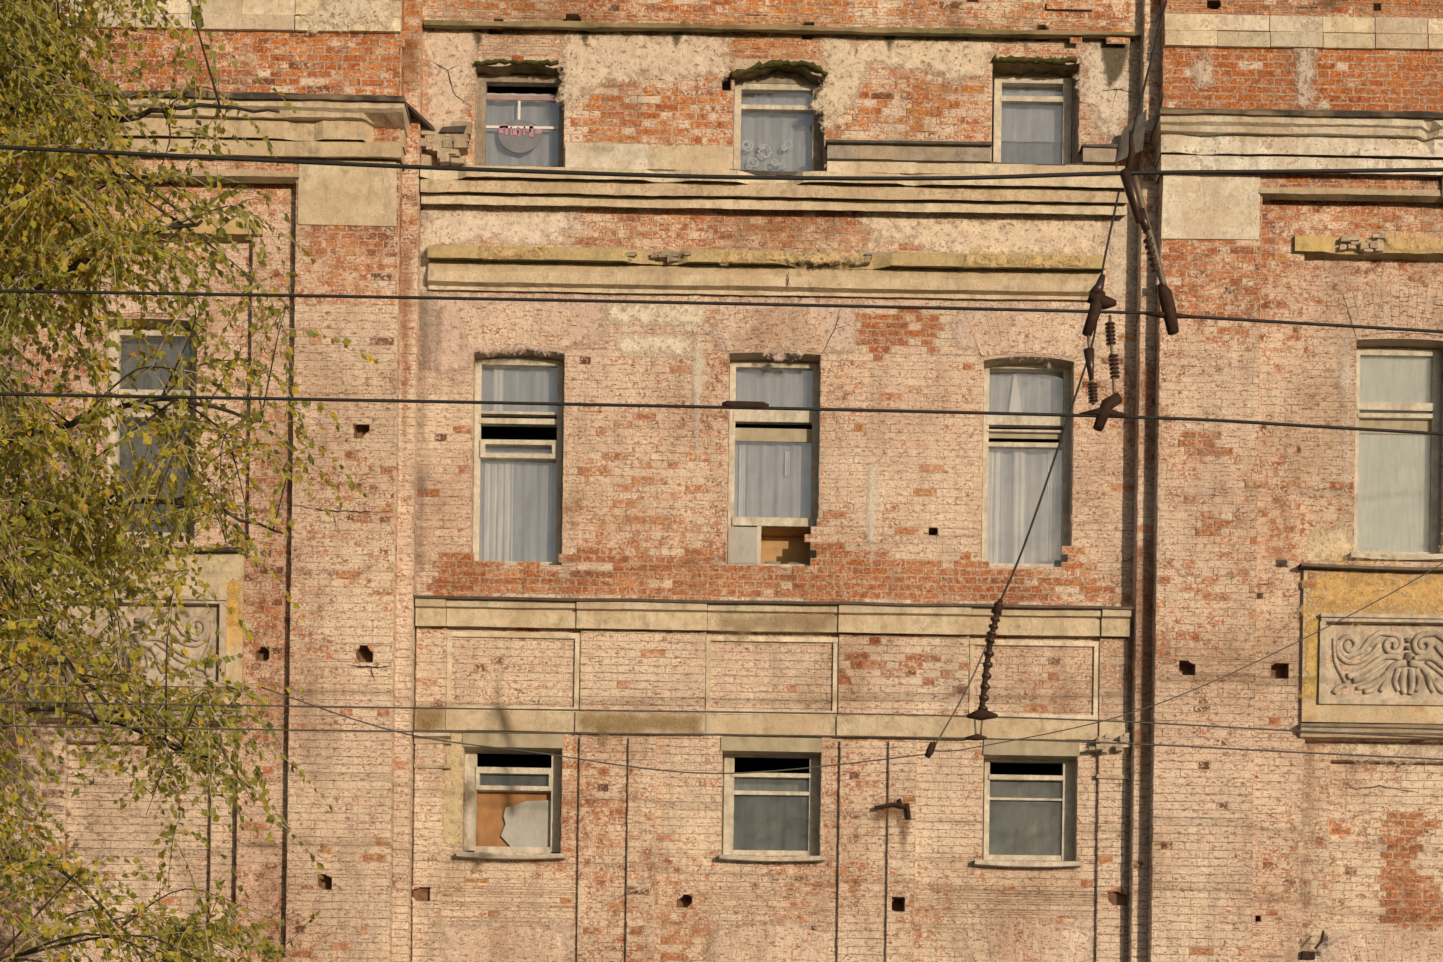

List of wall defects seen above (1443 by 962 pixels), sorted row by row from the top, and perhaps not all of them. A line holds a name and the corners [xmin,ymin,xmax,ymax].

flaking render [563,79,719,145]
flaking render [846,74,965,132]
flaking render [849,309,945,361]
flaking render [426,406,1133,605]
flaking render [1375,812,1443,932]